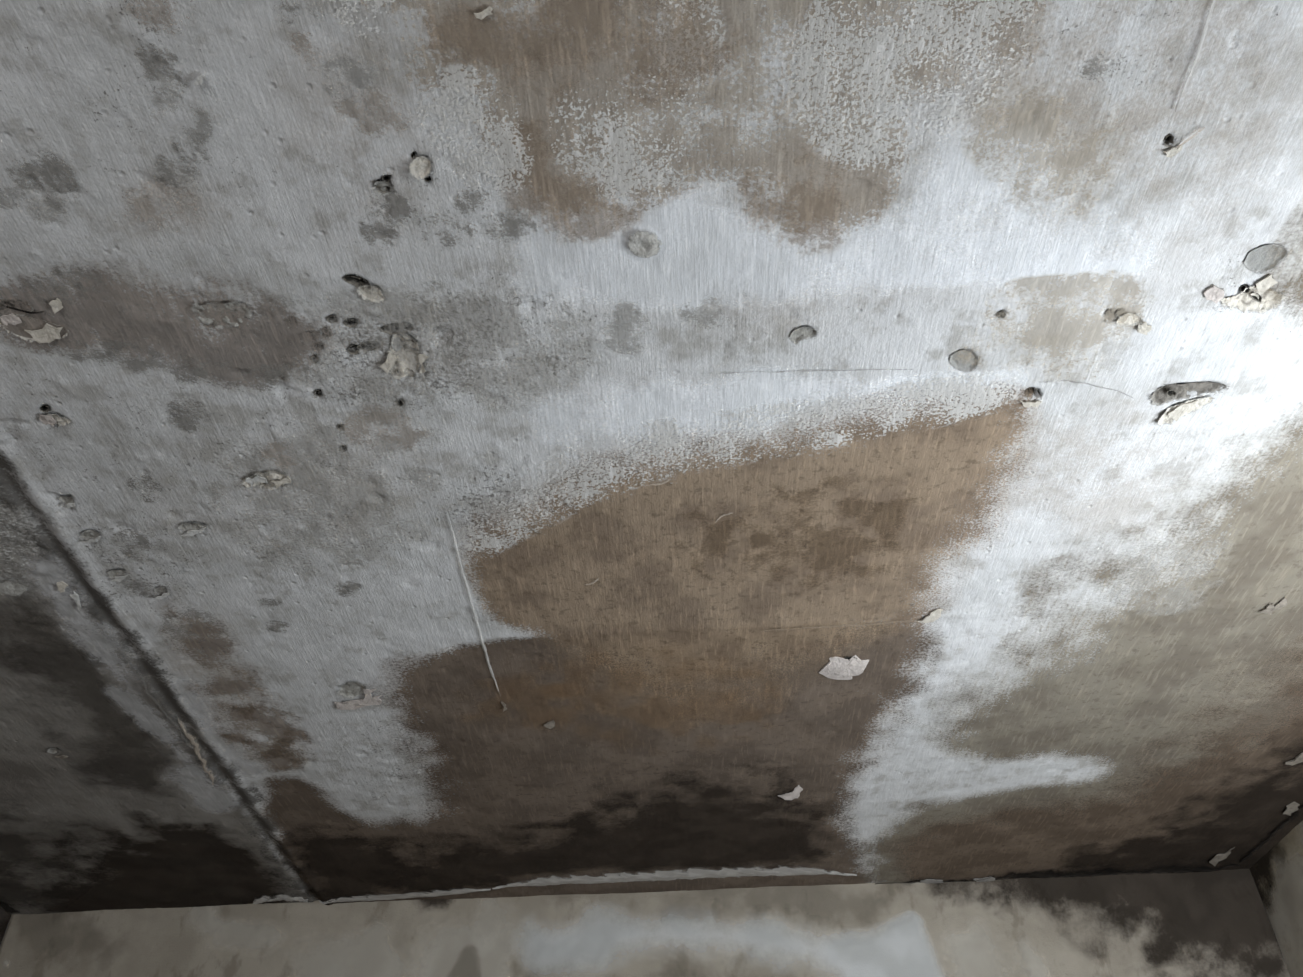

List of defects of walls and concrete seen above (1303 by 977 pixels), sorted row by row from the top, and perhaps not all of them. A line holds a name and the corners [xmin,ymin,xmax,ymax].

water stain [1078,54,1121,80]
water stain [281,0,1045,248]
water stain [0,151,78,224]
flaking render [1204,274,1287,314]
flaking render [0,298,69,344]
water stain [0,261,331,392]
flaking render [286,314,358,364]
flaking render [348,323,429,380]
flaking render [1149,381,1230,425]
water stain [0,375,1303,977]
peeling [819,655,869,680]